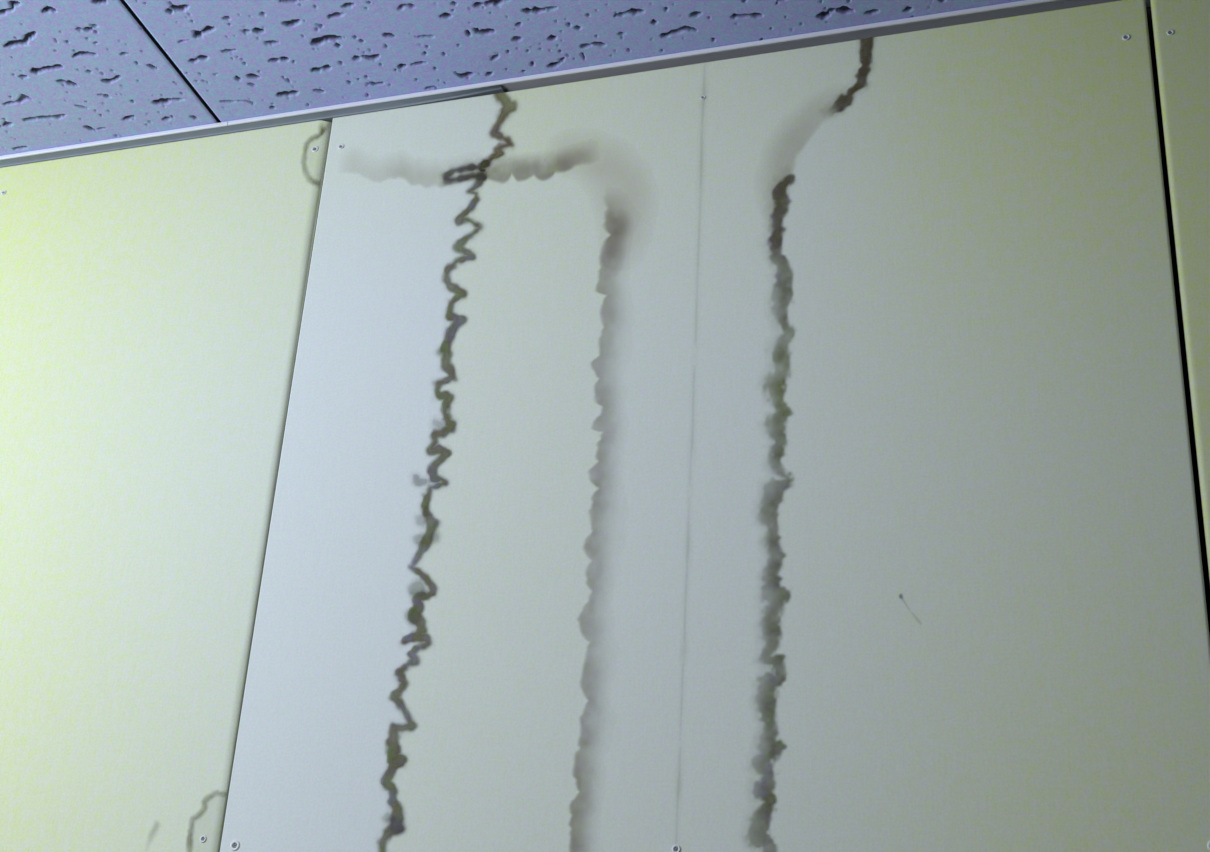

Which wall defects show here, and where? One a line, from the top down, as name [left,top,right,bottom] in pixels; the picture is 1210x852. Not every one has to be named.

damp [302,172,323,300]
damp [379,92,515,852]